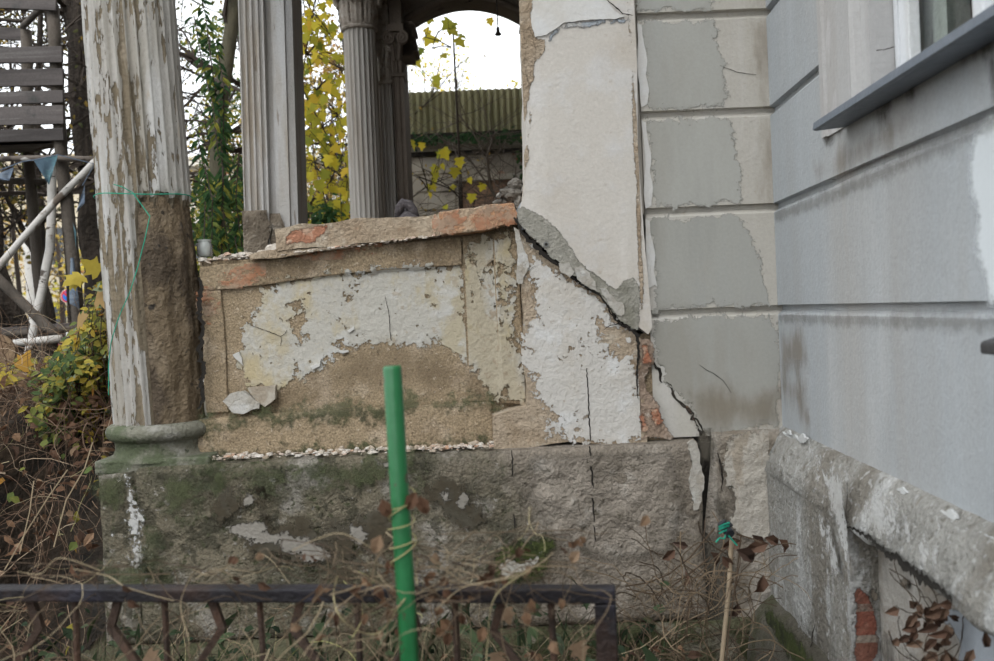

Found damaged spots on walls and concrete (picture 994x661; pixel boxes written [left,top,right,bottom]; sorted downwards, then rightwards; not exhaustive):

peeling [81,0,674,446]
crack [514,217,724,598]
spalling [440,488,469,509]
peeling [687,429,770,547]
spalling [225,520,331,562]
spalling [349,523,369,549]
flaking render [854,587,879,661]